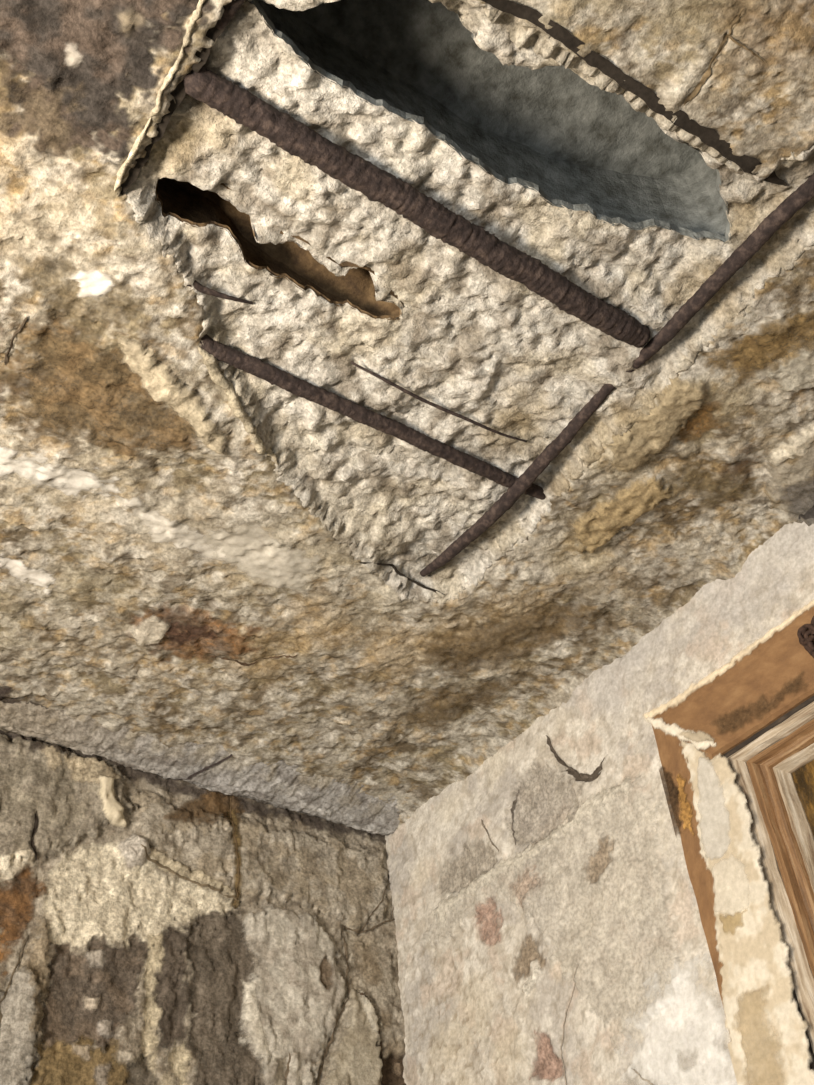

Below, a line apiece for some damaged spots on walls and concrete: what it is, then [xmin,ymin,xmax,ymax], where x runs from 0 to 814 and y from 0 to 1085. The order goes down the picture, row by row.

peeling [66,46,80,66]
damp [0,0,214,166]
spalling [114,0,814,605]
corrosion [707,314,814,383]
crack [798,506,814,520]
crack [30,813,38,861]
crack [140,795,240,907]
crack [0,933,31,1024]
crack [317,883,395,1085]
crack [284,1053,292,1085]